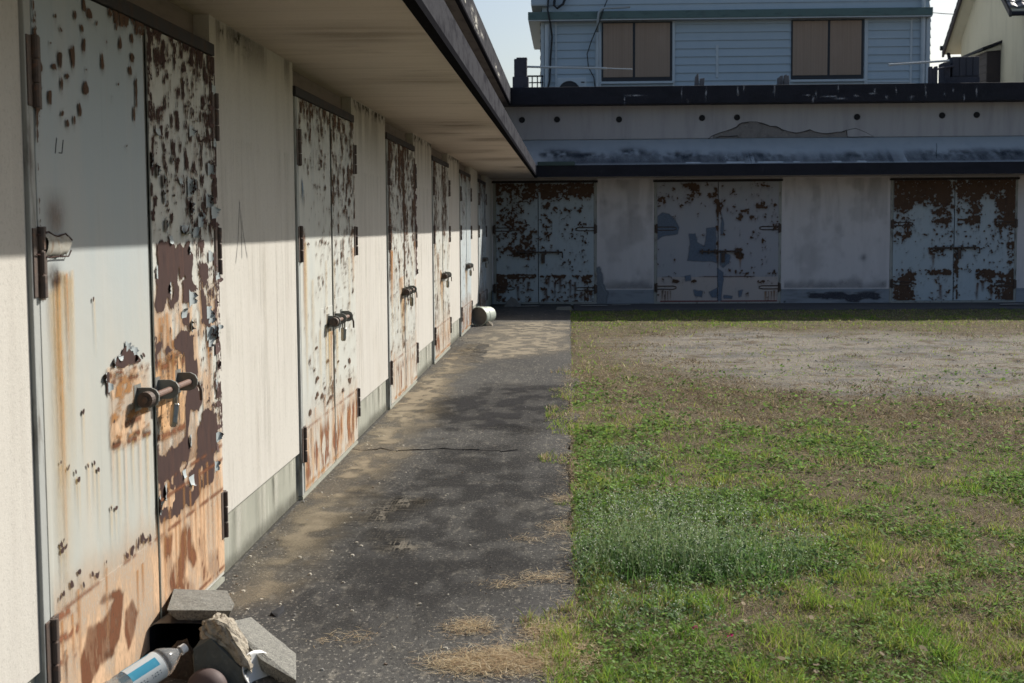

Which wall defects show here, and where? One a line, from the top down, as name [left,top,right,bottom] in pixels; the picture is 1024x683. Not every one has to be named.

peeling [36,0,224,523]
peeling [657,182,778,283]
rust [59,297,225,683]
rust [305,394,357,490]
crack [352,446,517,454]
spalling [126,533,152,559]